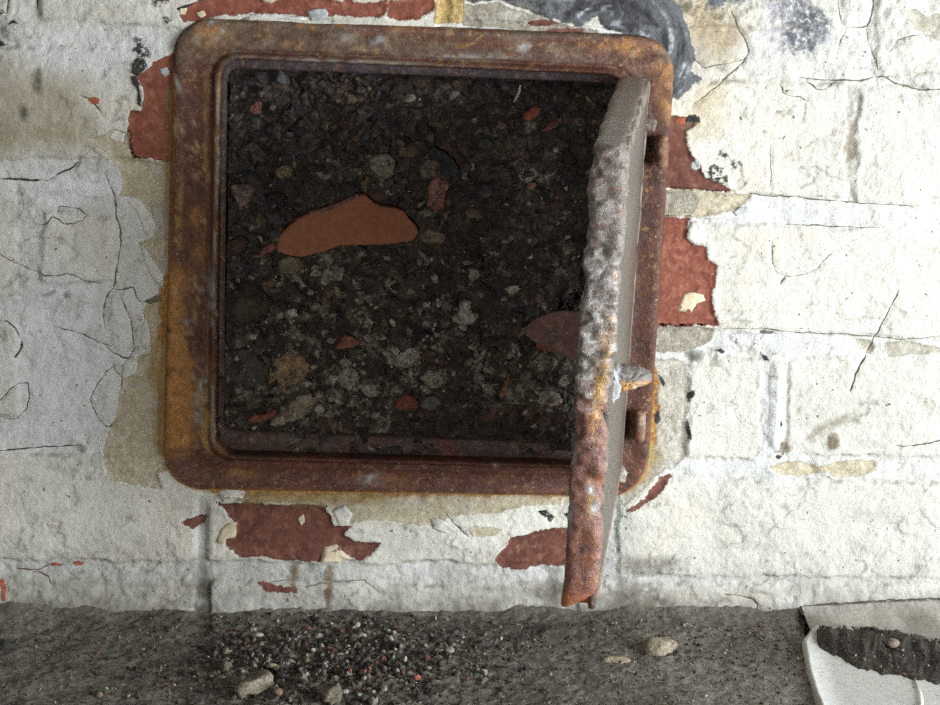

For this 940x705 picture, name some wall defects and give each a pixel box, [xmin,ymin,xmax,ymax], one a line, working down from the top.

spalling [178,0,599,33]
crack [695,11,750,103]
crack [781,0,940,101]
crack [0,173,143,427]
peeling [86,52,173,490]
rust [150,275,168,449]
spalling [622,115,751,512]
crack [724,290,929,392]
crack [750,148,912,284]
rust [640,368,661,482]
spalling [258,580,298,593]
spalling [212,490,569,570]